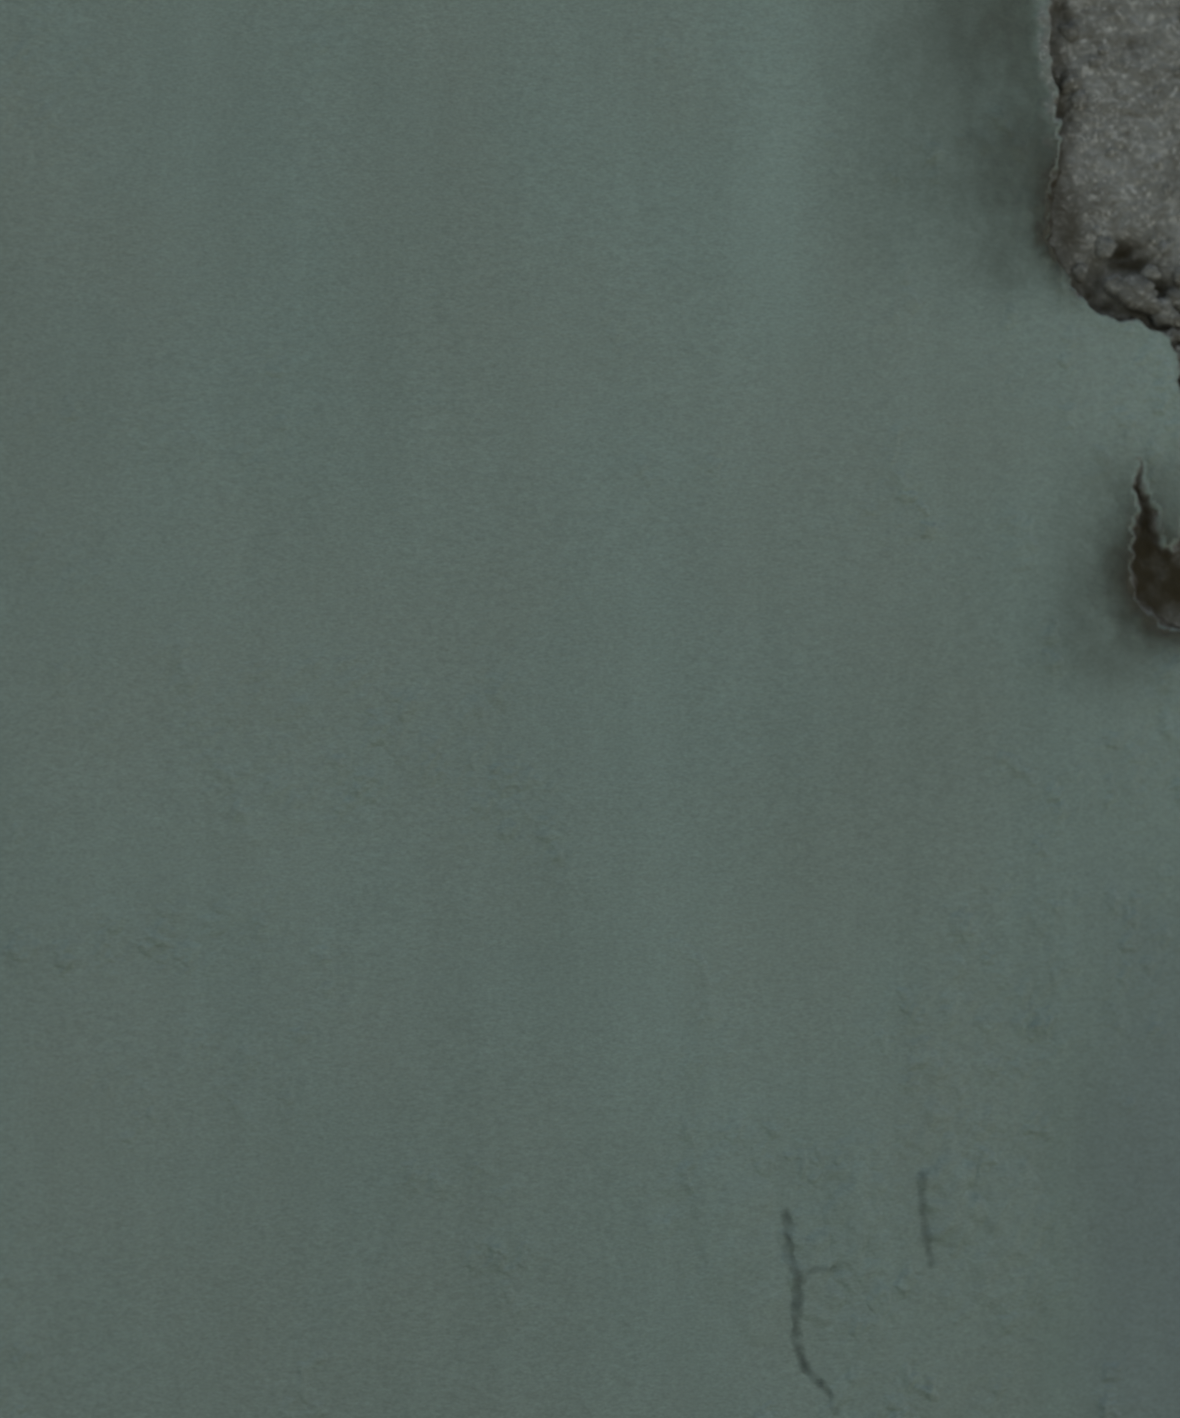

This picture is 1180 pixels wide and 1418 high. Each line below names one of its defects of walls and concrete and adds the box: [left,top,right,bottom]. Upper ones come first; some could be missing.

flaking render [1019,0,1180,416]
flaking render [1109,436,1180,647]